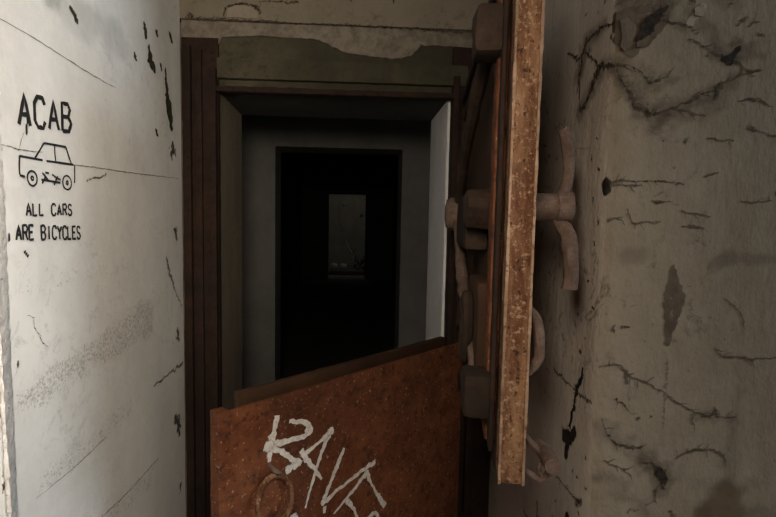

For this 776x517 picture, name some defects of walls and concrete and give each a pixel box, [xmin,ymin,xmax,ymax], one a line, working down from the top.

flaking render [169,0,473,60]
flaking render [610,0,712,58]
flaking render [143,22,173,131]
crack [567,0,762,121]
crack [739,98,774,107]
crack [707,124,776,147]
crack [602,175,711,234]
leakage [663,265,686,346]
crack [553,350,736,506]